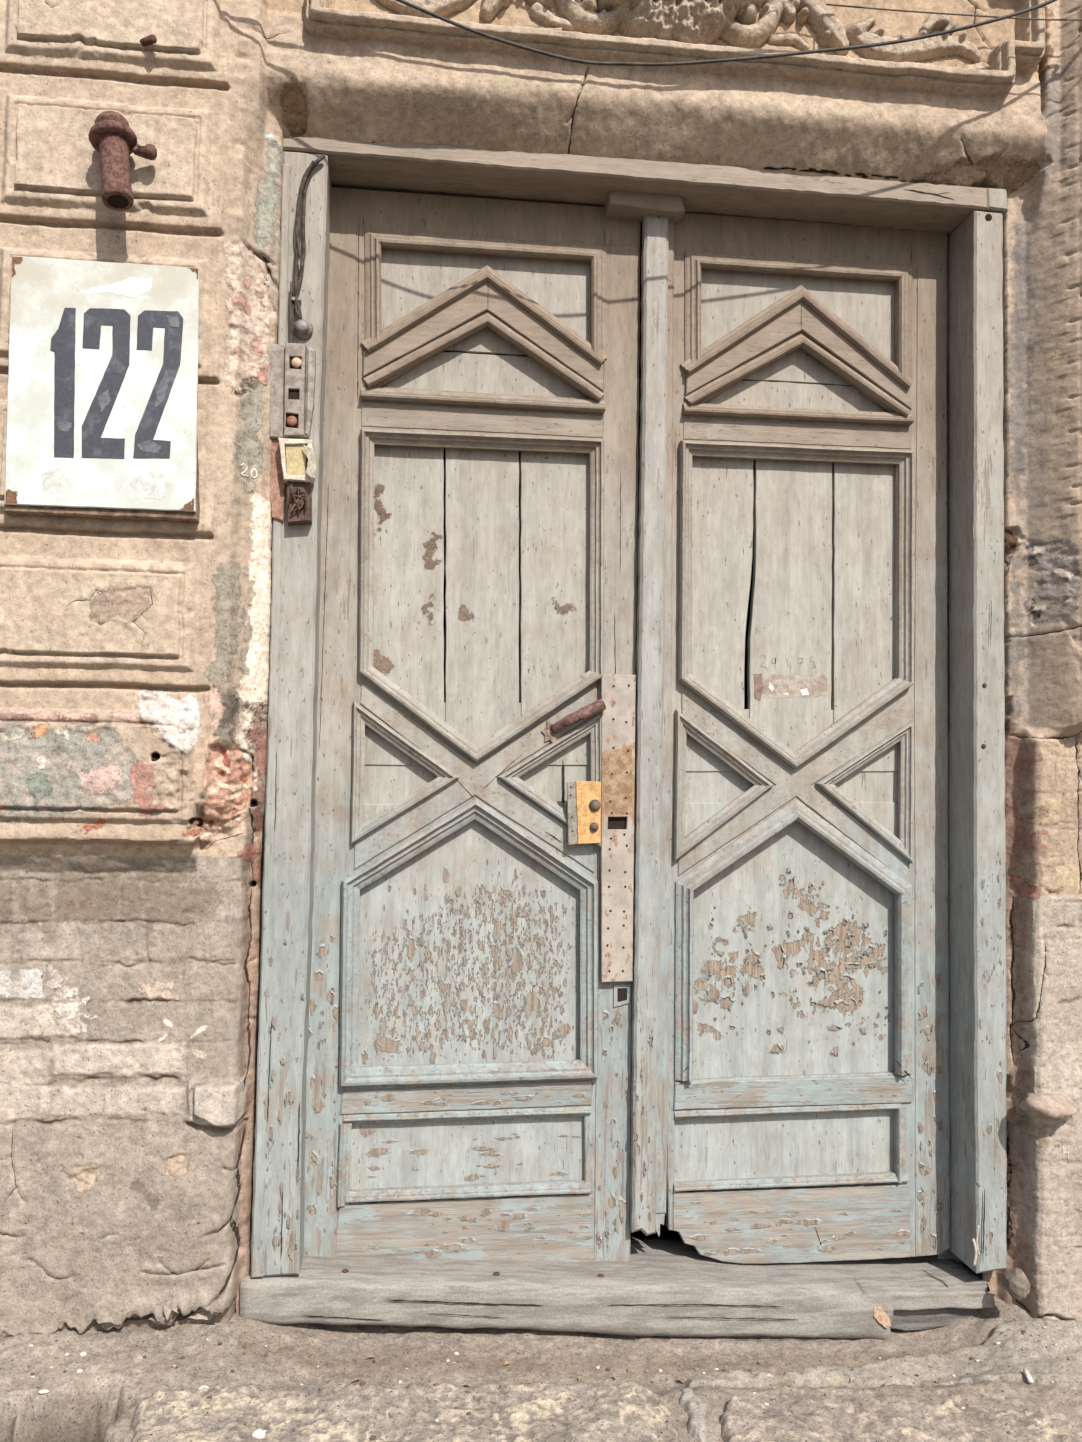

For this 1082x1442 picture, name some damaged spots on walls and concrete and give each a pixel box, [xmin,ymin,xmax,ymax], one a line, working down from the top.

crack [568,69,588,154]
flaking render [1004,529,1082,626]
peeling [0,709,165,834]
peeling [361,865,577,1064]
peeling [693,868,892,1057]
crack [145,758,261,1306]
crack [5,1132,25,1201]
crack [0,1233,72,1280]